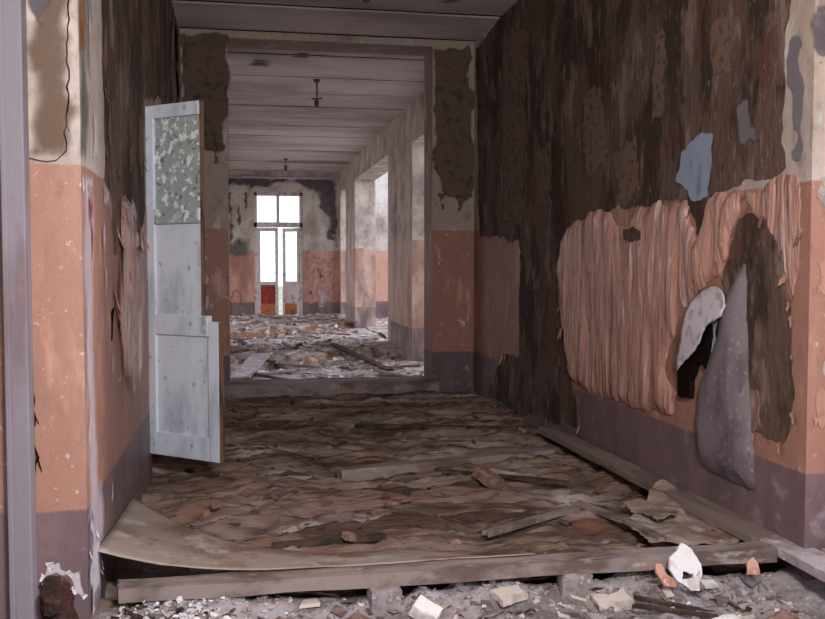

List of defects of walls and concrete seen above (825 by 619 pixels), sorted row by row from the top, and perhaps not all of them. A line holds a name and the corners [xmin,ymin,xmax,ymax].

peeling [101,0,183,258]
peeling [476,0,804,454]
flaking render [38,509,104,619]